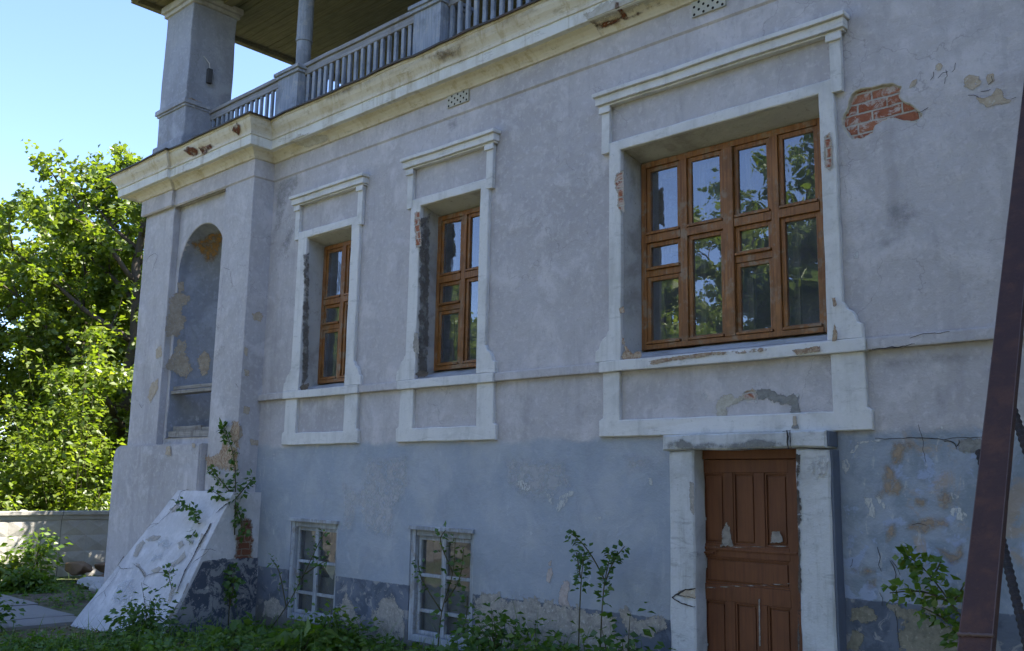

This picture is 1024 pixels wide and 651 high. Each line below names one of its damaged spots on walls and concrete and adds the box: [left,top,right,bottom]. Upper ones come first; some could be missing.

flaking render [841,79,923,140]
peeling [964,74,1011,107]
flaking render [614,170,625,212]
peeling [156,282,211,379]
spalling [621,338,766,365]
spalling [792,346,820,355]
flaking render [703,388,800,429]
flaking render [205,406,258,472]
crack [875,424,978,461]
flaking render [339,593,406,646]
flaking render [473,561,667,651]